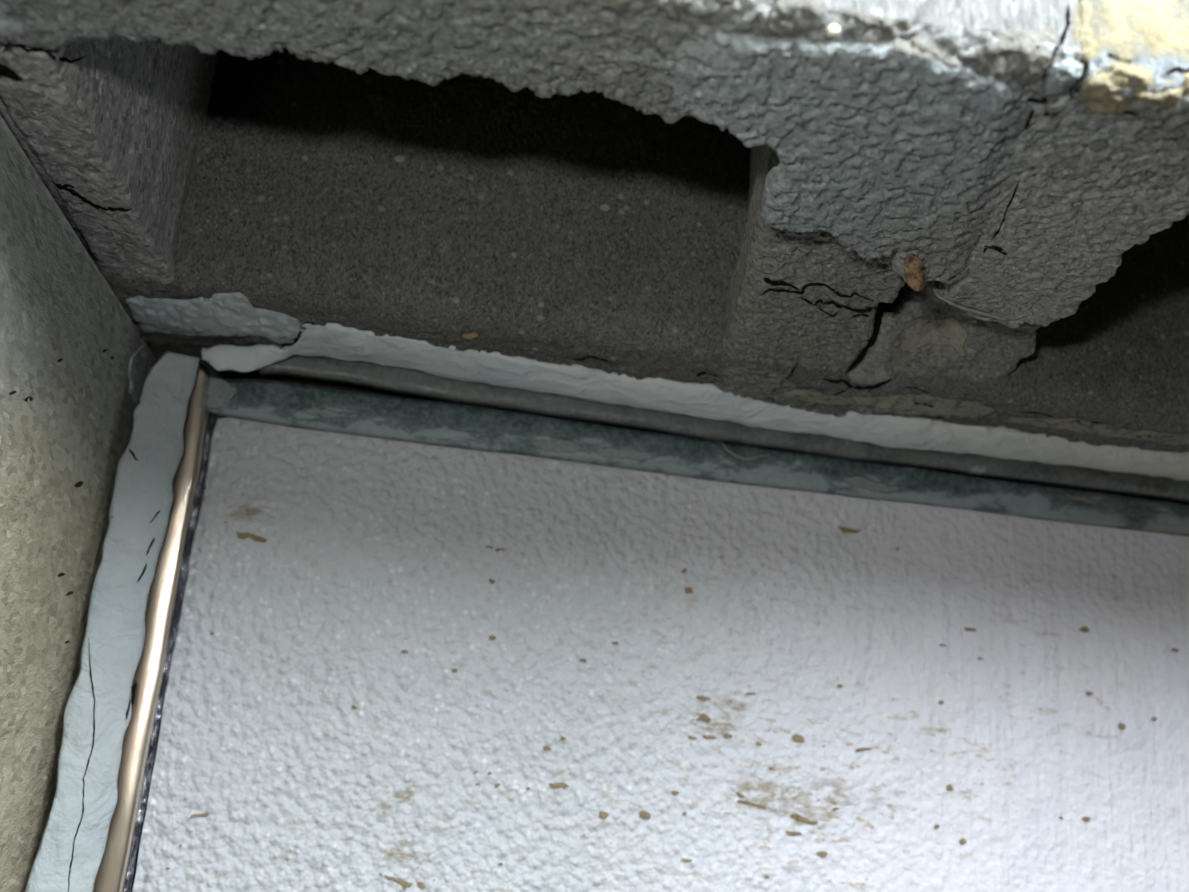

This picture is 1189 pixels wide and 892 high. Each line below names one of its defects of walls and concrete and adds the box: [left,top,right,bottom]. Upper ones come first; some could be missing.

water stain [1075,0,1189,59]
crack [762,278,933,408]